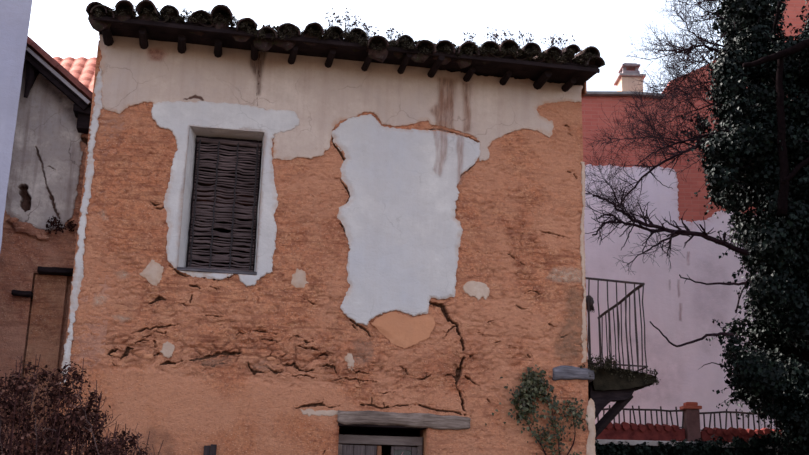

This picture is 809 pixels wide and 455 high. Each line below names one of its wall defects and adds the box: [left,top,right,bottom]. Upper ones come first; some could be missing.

crack [33,145,64,228]
crack [146,292,169,306]
peeling [5,33,583,388]
crack [300,296,318,307]
crack [292,299,483,419]
peeling [565,162,587,363]